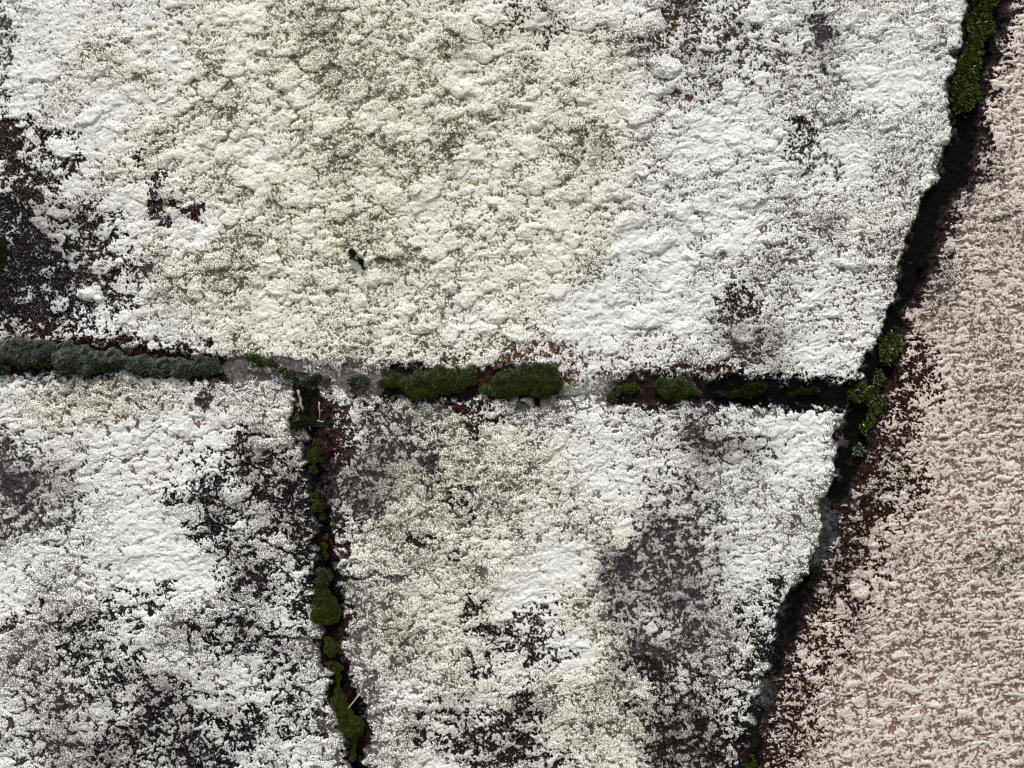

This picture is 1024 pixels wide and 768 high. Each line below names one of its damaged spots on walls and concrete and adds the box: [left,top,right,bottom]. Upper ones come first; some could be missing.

crack [0,336,229,386]
leakage [119,259,158,284]
leakage [147,169,206,231]
crack [383,356,560,408]
crack [612,0,1024,768]
leakage [0,400,476,768]
crack [292,384,371,768]
leakage [599,395,802,768]